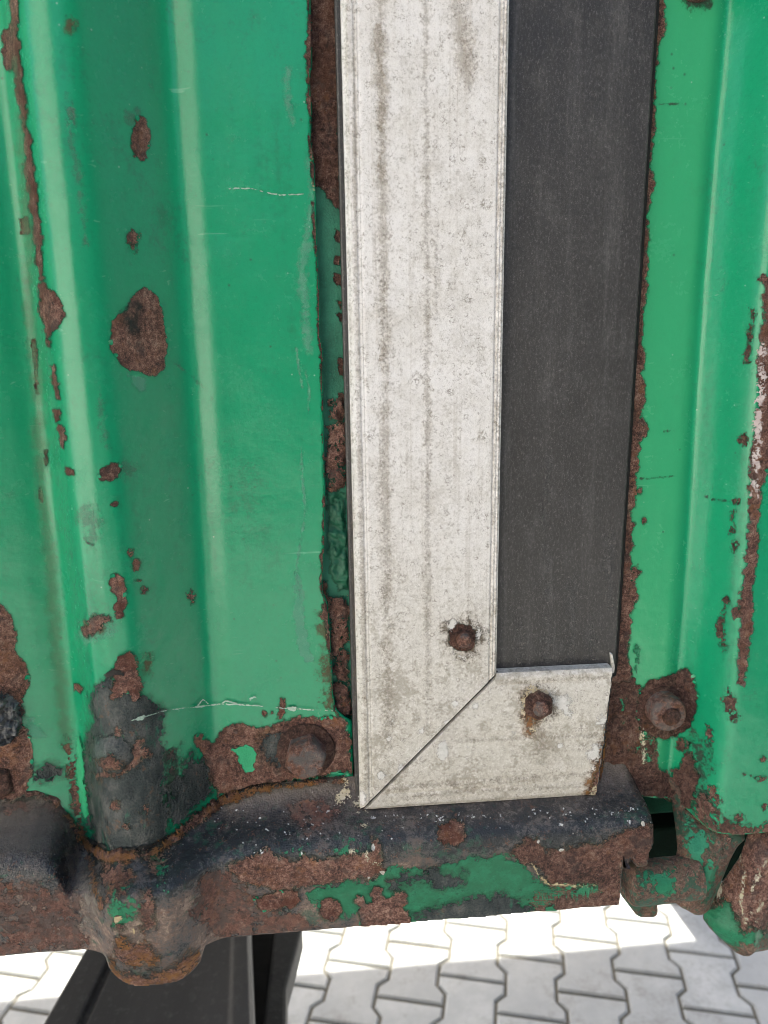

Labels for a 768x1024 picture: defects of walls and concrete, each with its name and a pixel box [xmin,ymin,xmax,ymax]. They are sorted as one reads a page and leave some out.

corrosion [304,0,339,209]
corrosion [1,0,67,450]
corrosion [584,0,768,935]
corrosion [0,202,352,986]
corrosion [440,616,490,664]
corrosion [520,684,558,736]
corrosion [188,836,411,937]
corrosion [437,818,467,846]
corrosion [511,821,653,911]